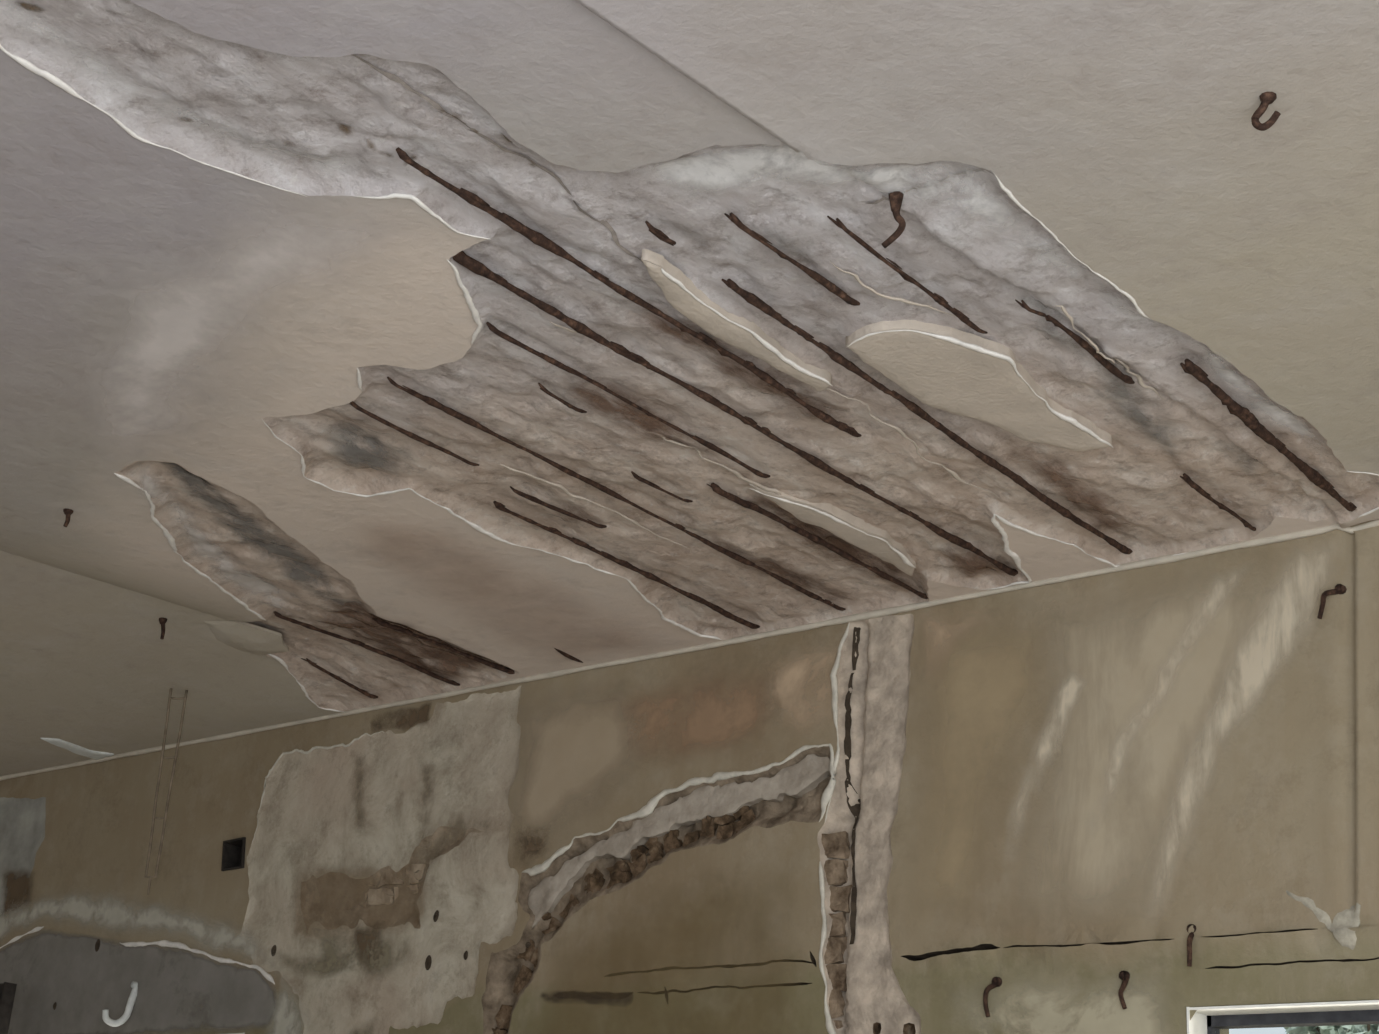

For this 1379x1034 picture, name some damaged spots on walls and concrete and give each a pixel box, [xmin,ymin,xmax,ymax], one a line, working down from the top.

spalling [349,401,479,466]
corrosion [577,388,682,443]
flaking render [370,145,1135,629]
spalling [1180,359,1357,512]
corrosion [756,502,904,587]
corrosion [951,554,999,576]
spalling [1180,473,1256,531]
corrosion [326,603,483,676]
damp [1037,554,1326,898]
flaking render [0,797,46,919]
flaking render [239,611,831,1034]
flaking render [821,831,852,1029]